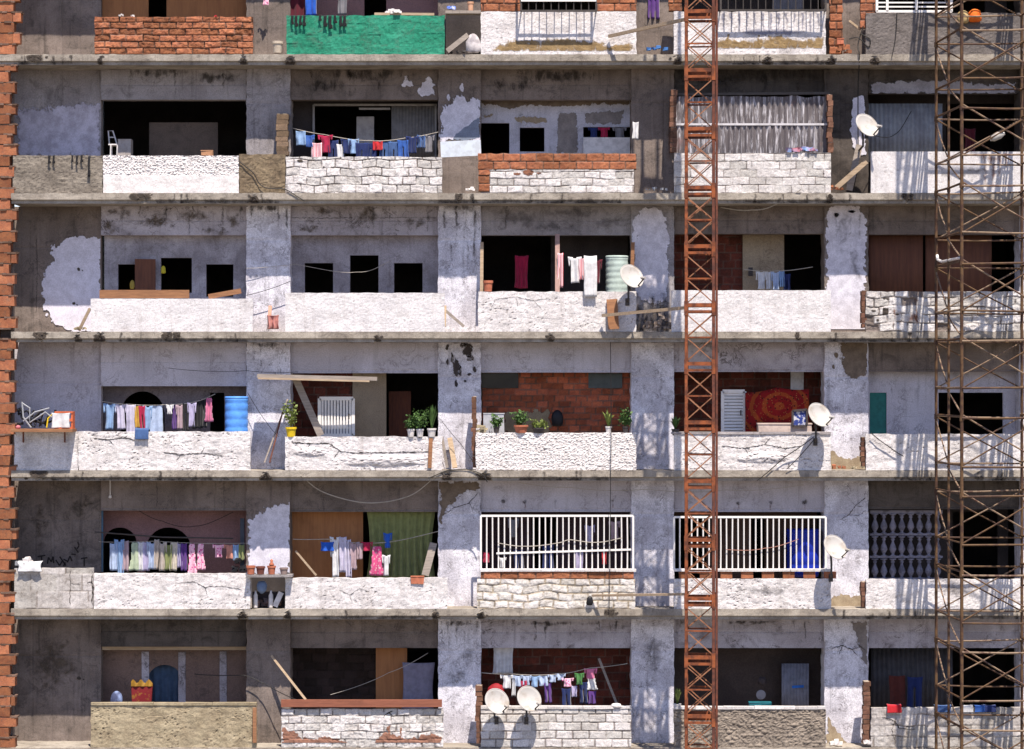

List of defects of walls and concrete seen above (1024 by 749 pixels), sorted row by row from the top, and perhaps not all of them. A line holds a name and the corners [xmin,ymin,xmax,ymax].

peeling [402,76,629,154]
peeling [850,79,1016,155]
peeling [33,236,105,342]
peeling [632,207,670,304]
peeling [825,194,899,329]
peeling [832,343,867,379]
crack [163,447,221,457]
crack [723,438,799,454]
peeling [830,450,862,469]
peeling [247,502,290,574]
peeling [282,727,347,743]
peeling [375,726,442,743]